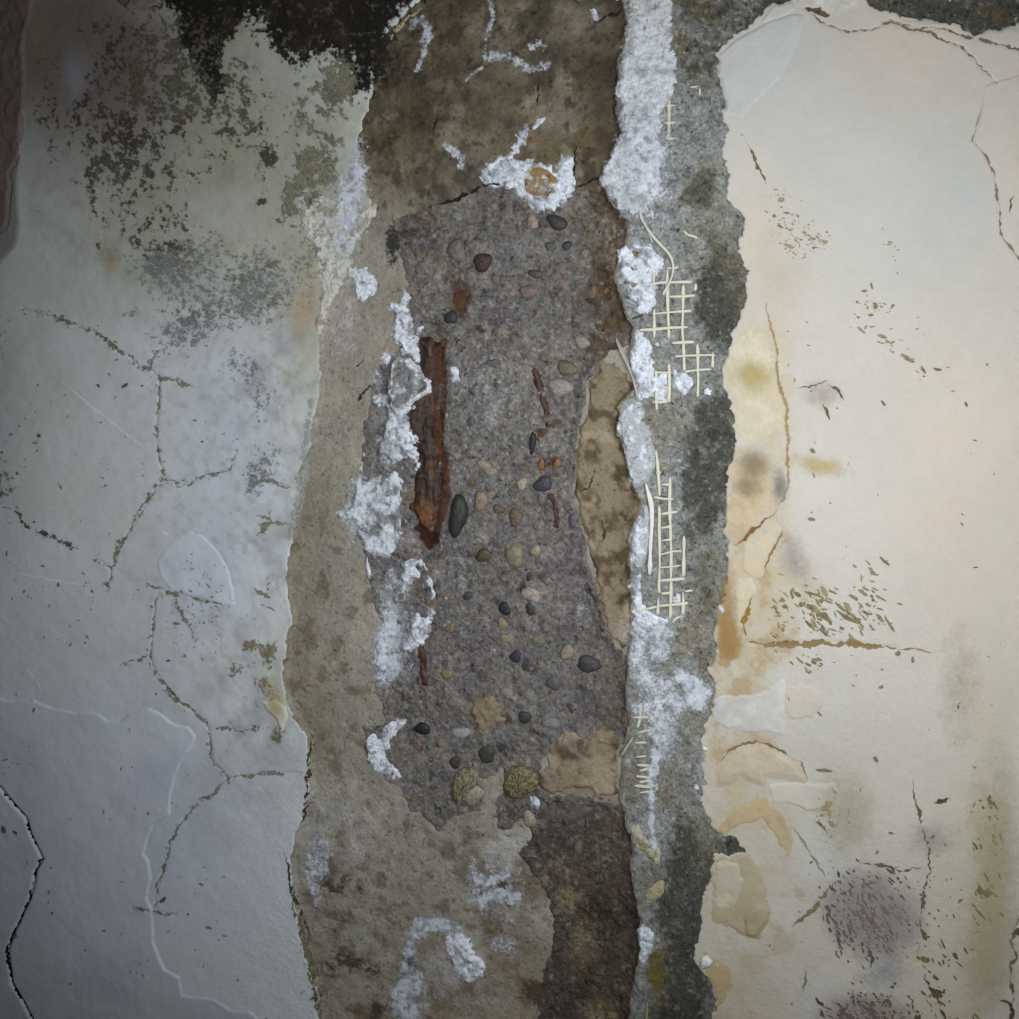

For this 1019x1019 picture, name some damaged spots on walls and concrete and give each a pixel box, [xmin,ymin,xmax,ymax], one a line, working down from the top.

crack [805,9,1019,83]
leakage [32,0,434,370]
crack [16,308,290,591]
crack [121,582,313,916]
efflorescence [335,290,436,696]
efflorescence [365,719,407,779]
corrosion [415,345,451,549]
spalling [261,0,1019,1019]
efflorescence [624,619,714,850]
crack [737,303,828,573]
crack [740,598,931,653]
efflorescence [371,914,516,1019]